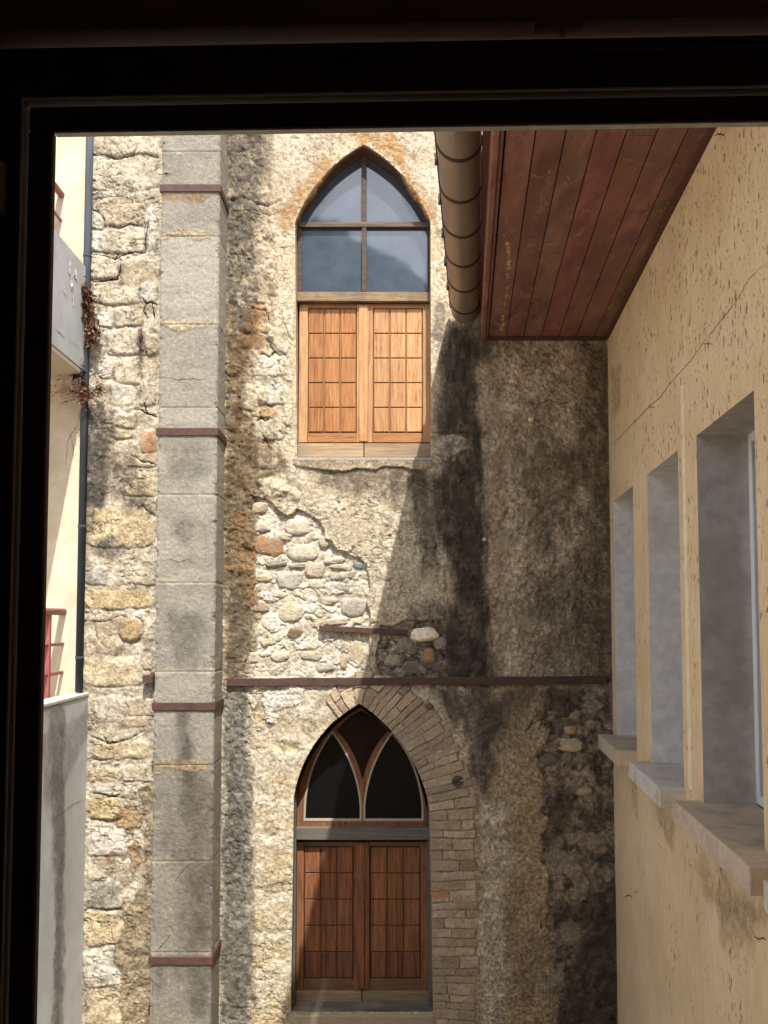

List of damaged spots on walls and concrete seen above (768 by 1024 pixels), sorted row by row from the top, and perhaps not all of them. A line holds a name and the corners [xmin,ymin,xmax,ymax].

crack [612,273,755,444]
spalling [246,498,446,724]
water stain [320,303,619,791]
water stain [45,705,71,1024]
spalling [535,691,617,1024]